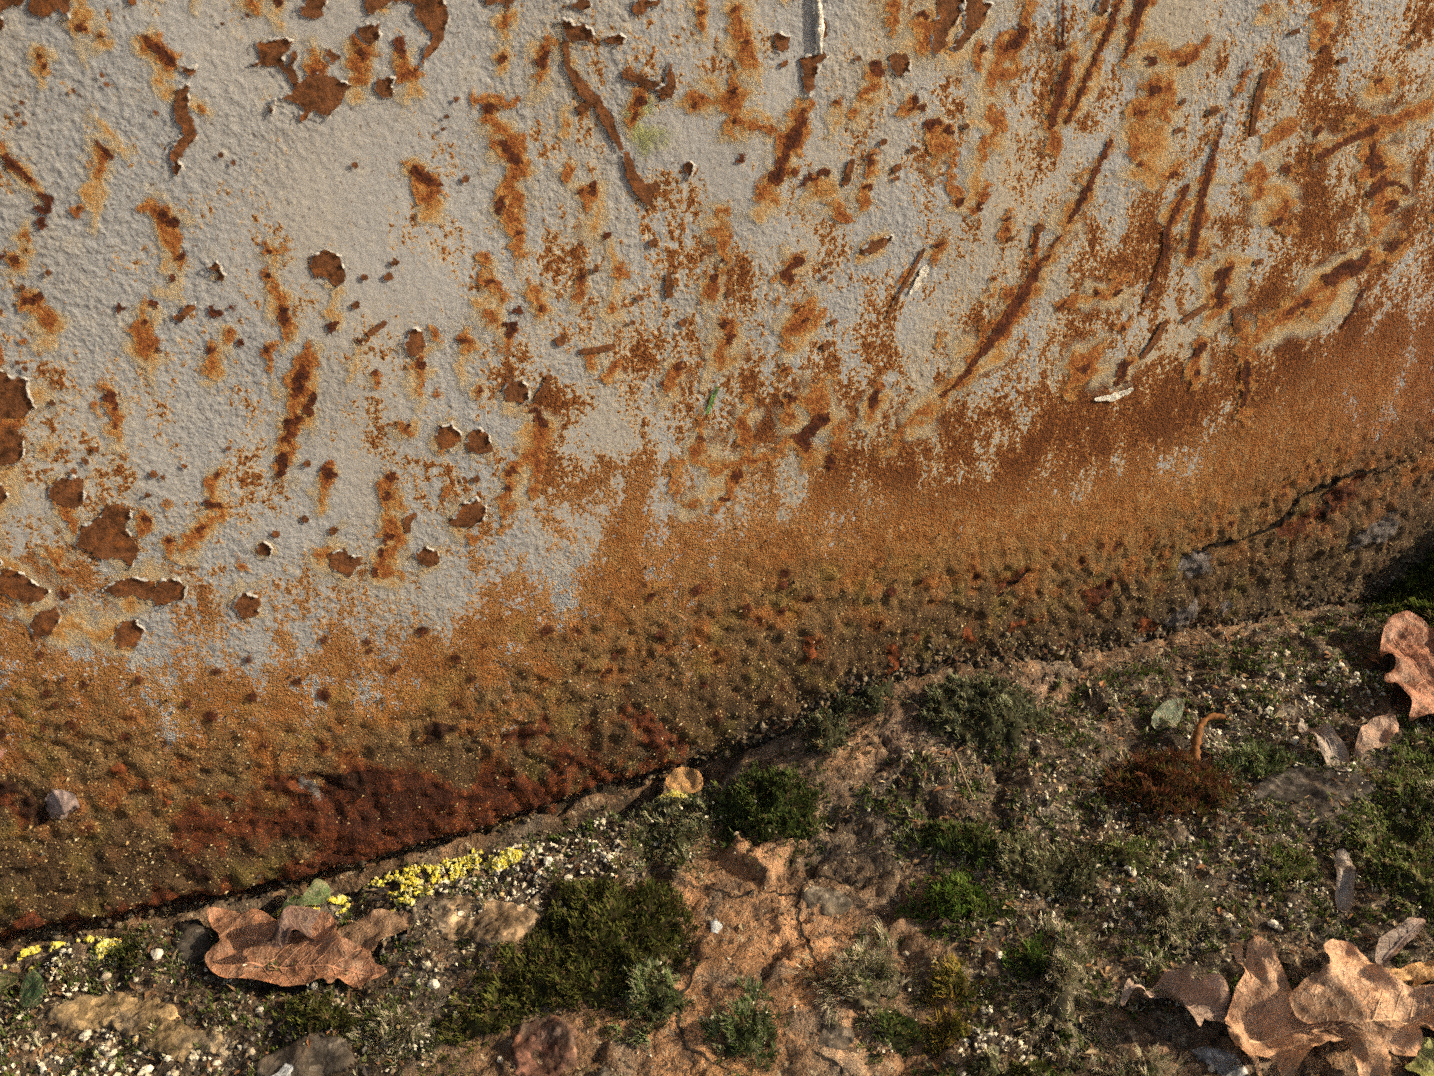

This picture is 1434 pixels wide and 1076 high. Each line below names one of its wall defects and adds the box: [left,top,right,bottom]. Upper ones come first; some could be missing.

peeling [250,0,351,123]
peeling [373,76,396,100]
peeling [365,0,451,68]
corrosion [1117,34,1217,192]
corrosion [1242,60,1434,244]
corrosion [0,110,232,656]
corrosion [198,21,644,590]
corrosion [622,0,1039,521]
corrosion [1054,251,1264,436]
corrosion [229,557,265,620]
crack [1197,457,1415,554]
corrosion [0,698,700,944]